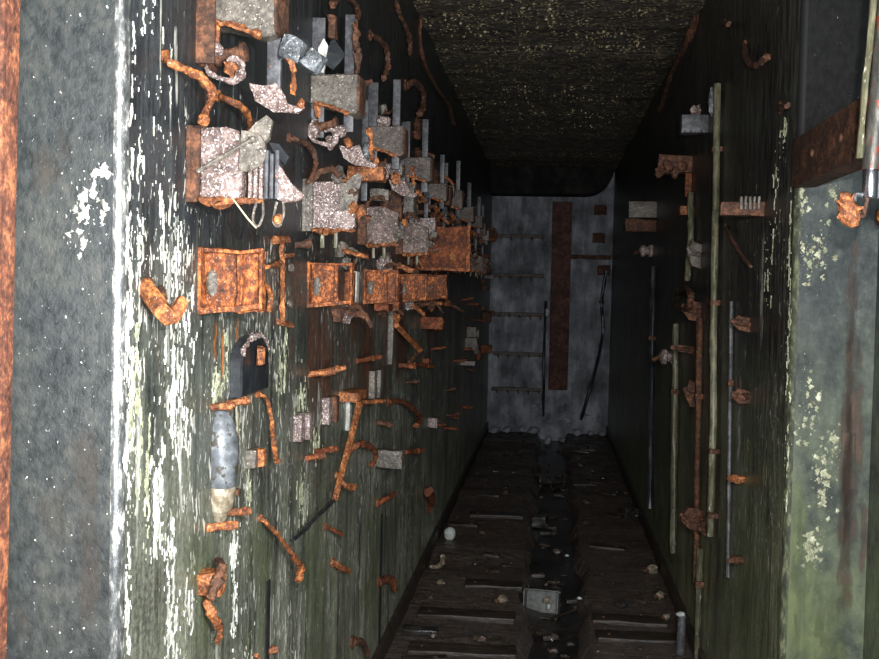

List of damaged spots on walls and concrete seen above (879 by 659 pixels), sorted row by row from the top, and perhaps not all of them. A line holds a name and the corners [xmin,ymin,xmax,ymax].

peeling [125,0,173,127]
peeling [115,134,202,659]
peeling [207,329,229,404]
peeling [242,468,252,507]
peeling [230,516,241,638]